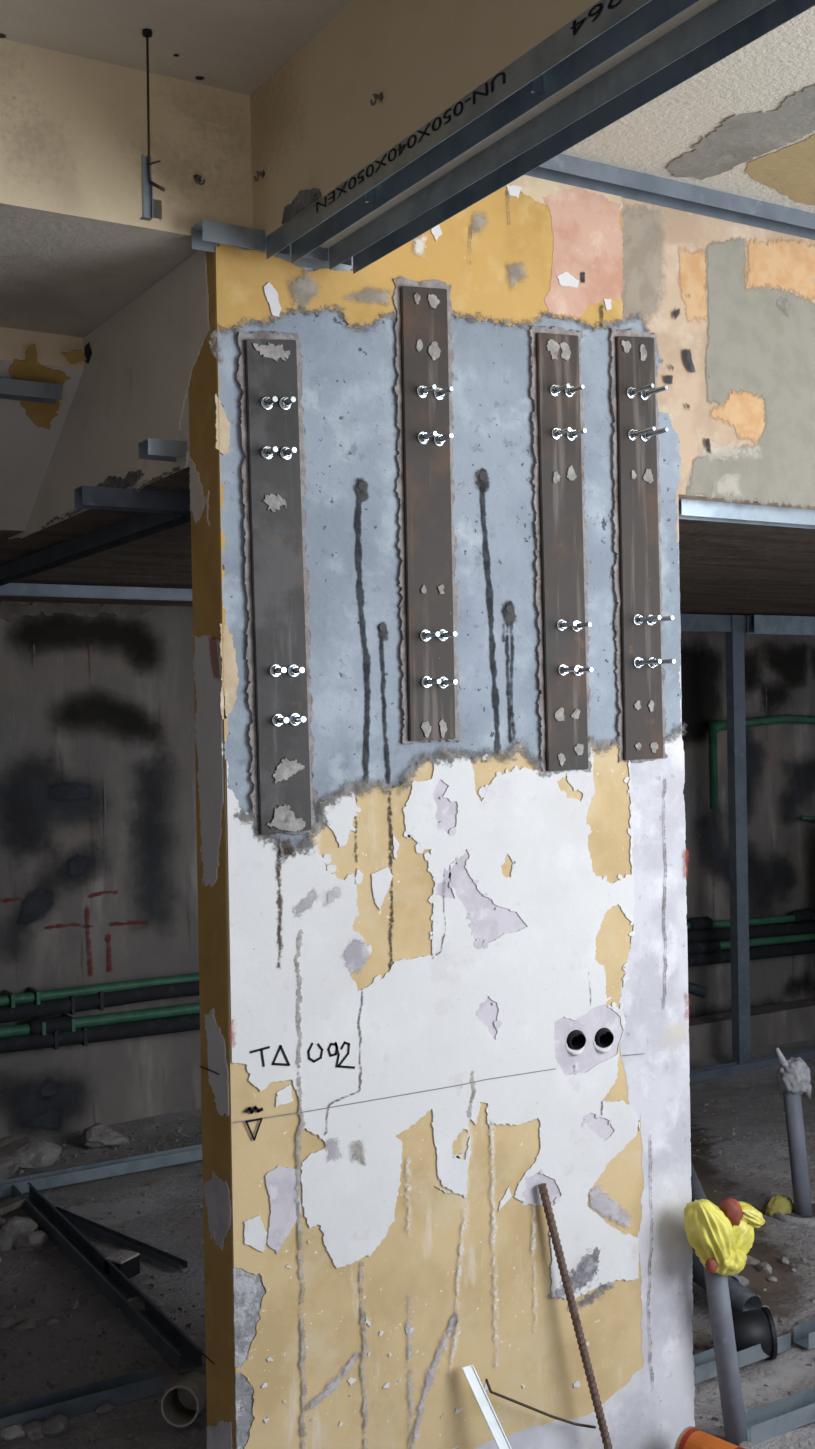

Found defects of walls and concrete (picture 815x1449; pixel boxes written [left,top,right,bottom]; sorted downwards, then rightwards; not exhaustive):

peeling [666,85,815,206]
peeling [8,342,92,430]
damp [476,468,517,753]
damp [0,761,101,957]
damp [135,759,169,920]
damp [354,478,394,969]
spalling [189,175,815,1449]
damp [746,728,761,814]
damp [748,851,796,916]
damp [783,760,815,820]
crack [294,930,363,1449]
crack [359,1262,368,1449]